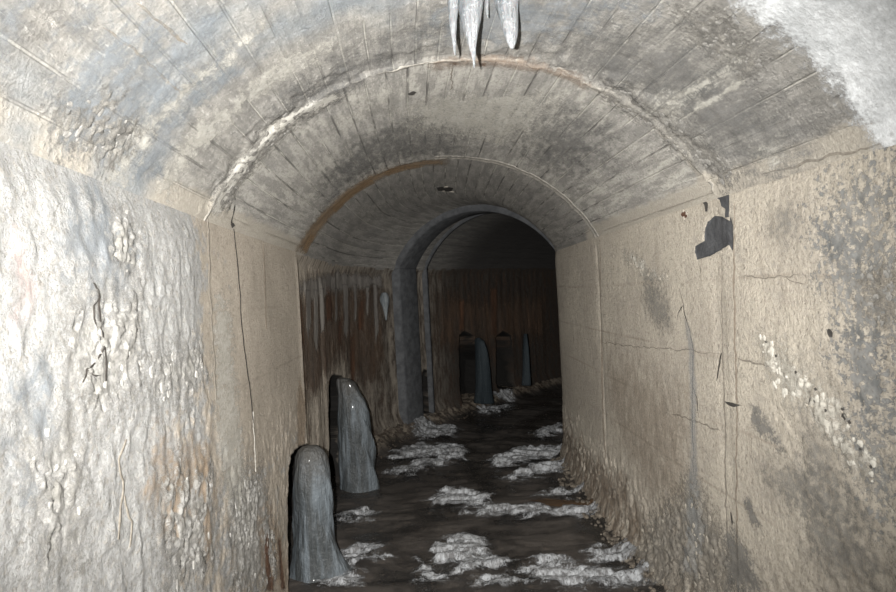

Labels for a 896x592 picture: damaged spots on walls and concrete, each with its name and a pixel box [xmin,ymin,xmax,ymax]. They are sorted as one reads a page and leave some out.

leakage [159,42,333,202]
leakage [212,36,403,216]
peeling [598,5,767,260]
leakage [589,33,790,172]
crack [82,283,107,383]
crack [231,206,256,472]
corrosion [300,284,384,401]
crack [601,293,771,514]
crack [744,274,803,284]
leakage [734,0,896,590]